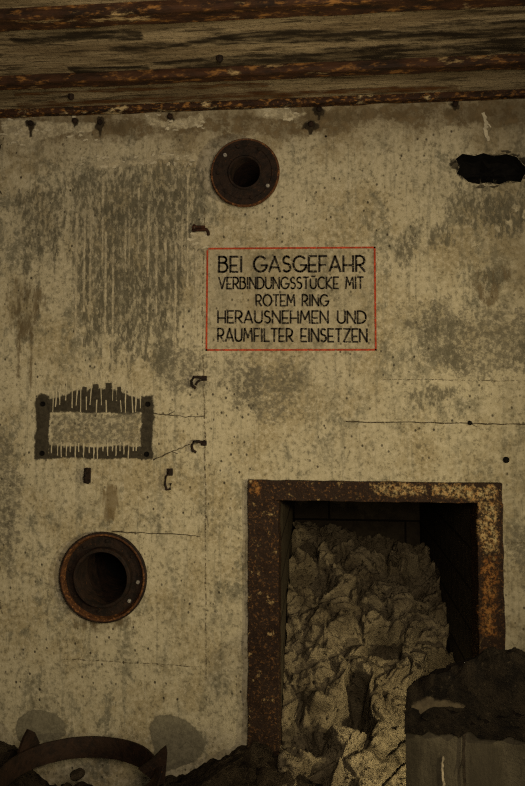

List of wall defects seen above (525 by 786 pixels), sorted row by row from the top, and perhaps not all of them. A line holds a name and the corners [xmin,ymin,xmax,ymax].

spalling [449,150,525,188]
leakage [12,156,208,393]
leakage [395,226,418,266]
leakage [429,182,525,250]
leakage [405,269,525,380]
leakage [218,361,304,423]
leakage [410,386,454,410]
corrosion [373,482,500,636]
spalling [405,697,469,720]